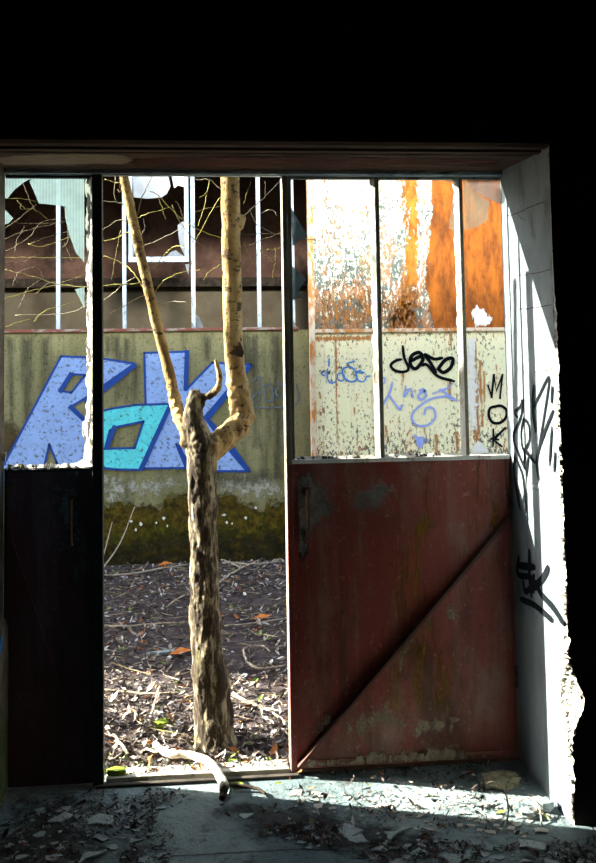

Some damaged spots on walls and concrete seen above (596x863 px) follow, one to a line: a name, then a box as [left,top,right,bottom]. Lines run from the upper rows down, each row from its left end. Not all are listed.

rust [315,180,505,442]
spalling [557,641,584,756]
rust [305,746,494,767]